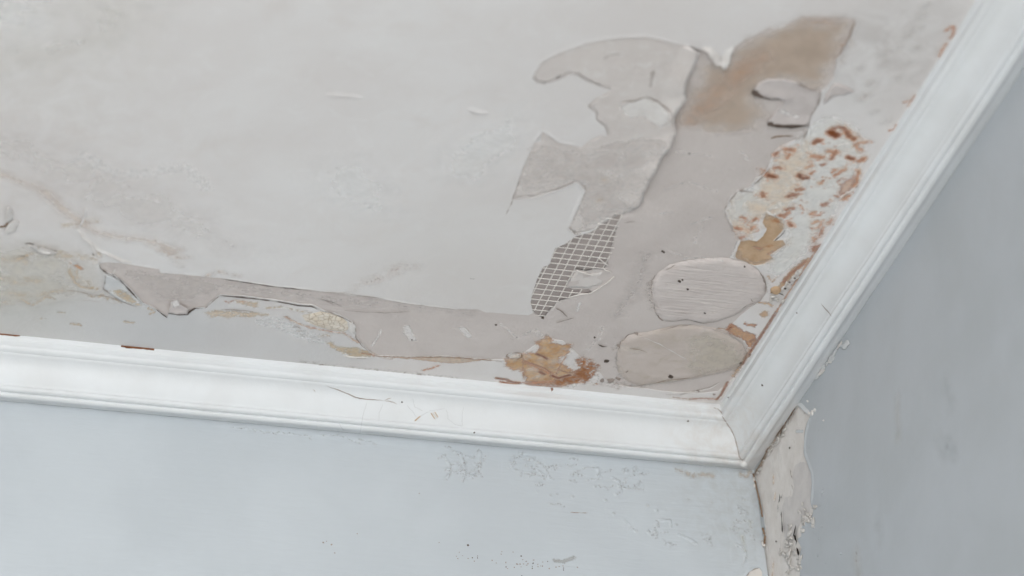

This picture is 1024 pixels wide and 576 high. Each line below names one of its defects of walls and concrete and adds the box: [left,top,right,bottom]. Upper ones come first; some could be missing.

peeling [92,16,857,393]
peeling [744,403,817,576]